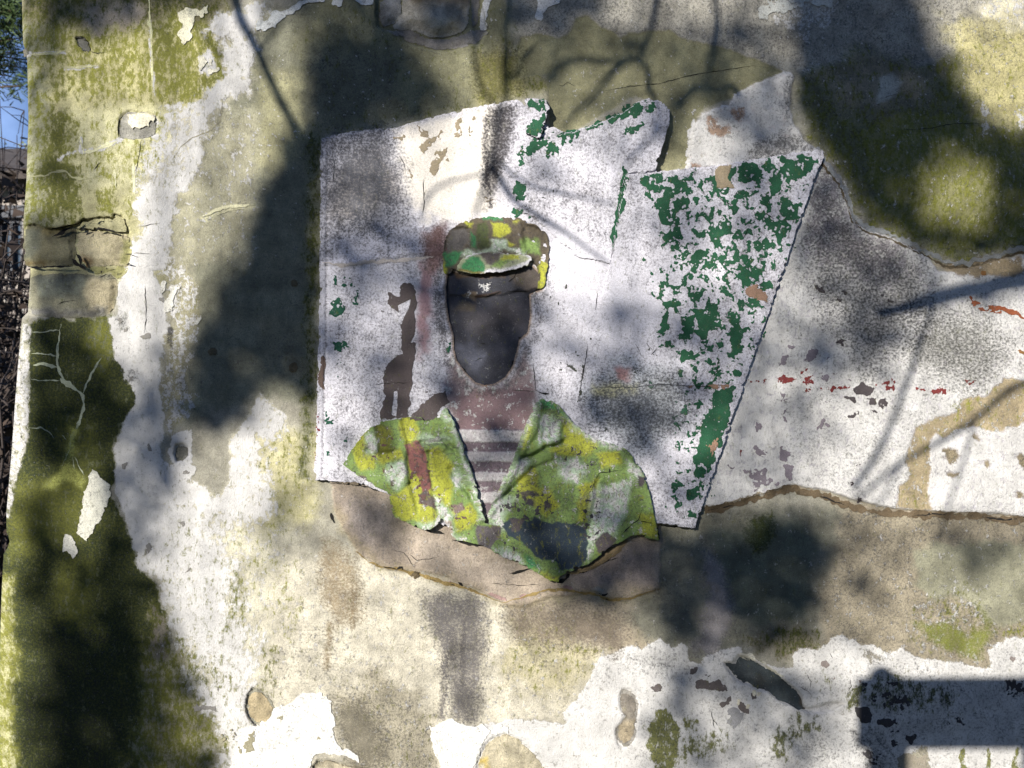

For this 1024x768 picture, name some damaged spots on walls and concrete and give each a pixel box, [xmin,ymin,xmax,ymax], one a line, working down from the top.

spalling [119,111,156,140]
peeling [511,99,657,219]
crack [28,215,159,277]
peeling [610,153,1024,539]
crack [31,301,101,475]
water stain [44,426,86,490]
peeling [62,469,111,558]
spalling [356,540,657,603]
peeling [429,718,544,768]
spalling [615,689,638,747]
spalling [690,653,805,729]
peeling [855,680,927,768]